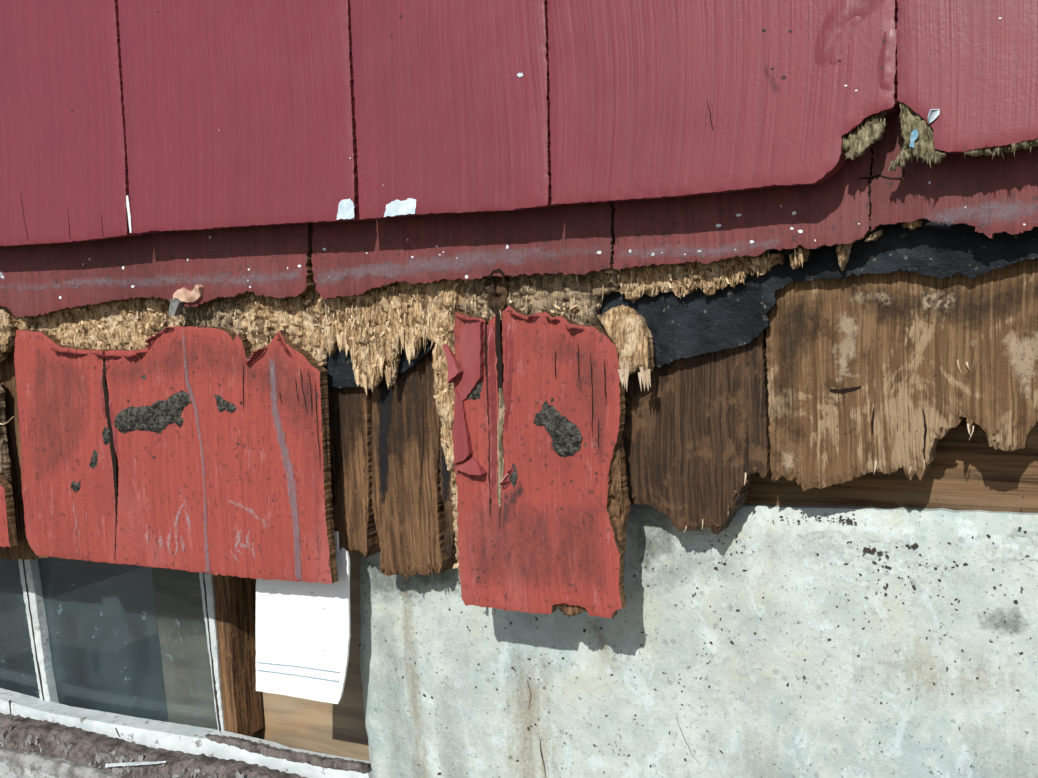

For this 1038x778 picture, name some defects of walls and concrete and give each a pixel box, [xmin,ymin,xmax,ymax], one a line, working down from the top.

peeling [50,284,204,360]
peeling [243,333,292,365]
peeling [833,316,860,382]
peeling [922,293,955,308]
peeling [1003,332,1038,398]
crack [484,314,505,529]
peeling [442,309,584,499]
crack [99,366,119,560]